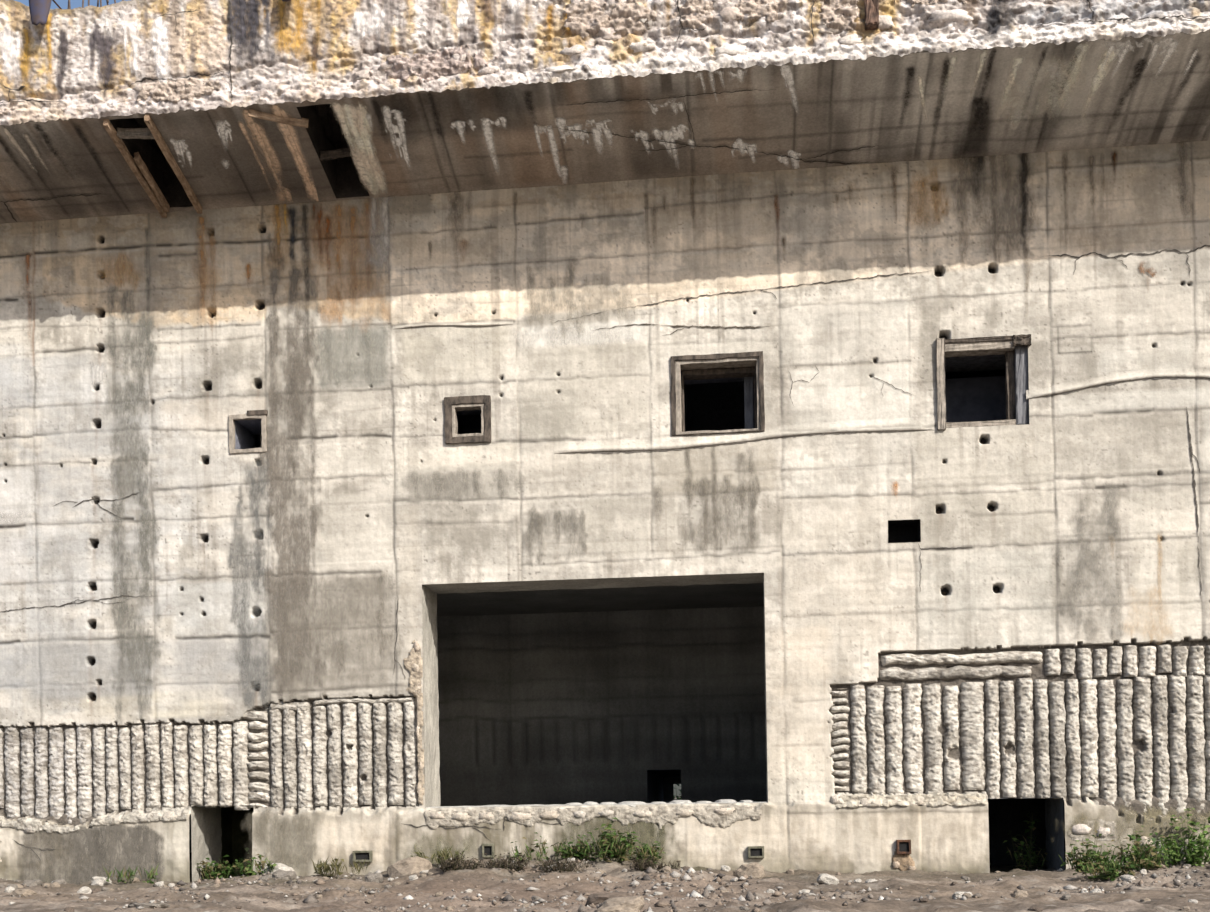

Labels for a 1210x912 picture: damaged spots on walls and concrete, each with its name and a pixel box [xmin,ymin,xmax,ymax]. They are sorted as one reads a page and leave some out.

spalling [103,77,243,218]
hole [248,104,369,198]
leakage [438,117,506,169]
efflorescence [635,103,694,158]
leakage [973,0,1014,131]
crack [554,271,928,335]
crack [1049,245,1210,276]
leakage [217,105,377,711]
leakage [108,289,157,719]
crack [1186,407,1202,601]
crack [0,595,156,612]
spalling [0,640,762,842]